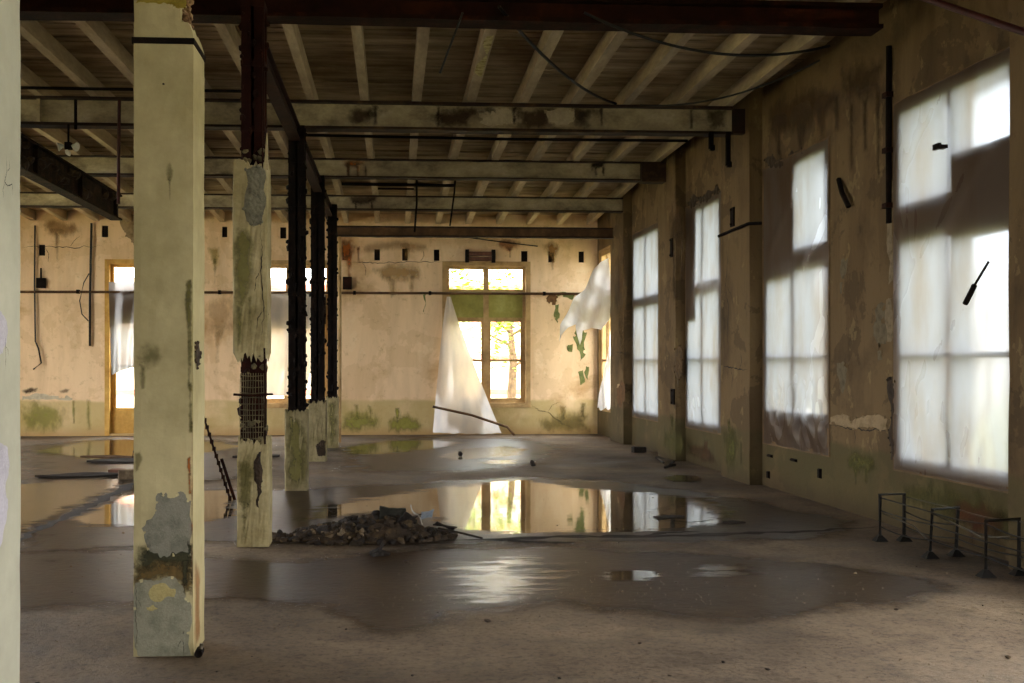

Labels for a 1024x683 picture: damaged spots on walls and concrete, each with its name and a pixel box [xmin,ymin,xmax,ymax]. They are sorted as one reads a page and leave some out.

peeling [135,0,194,30]
spalling [242,165,266,227]
peeling [546,292,575,323]
peeling [567,330,589,385]
water stain [544,404,584,430]
flaking render [830,376,896,460]
peeling [142,491,192,558]
water stain [20,435,948,632]
peeling [134,576,192,657]